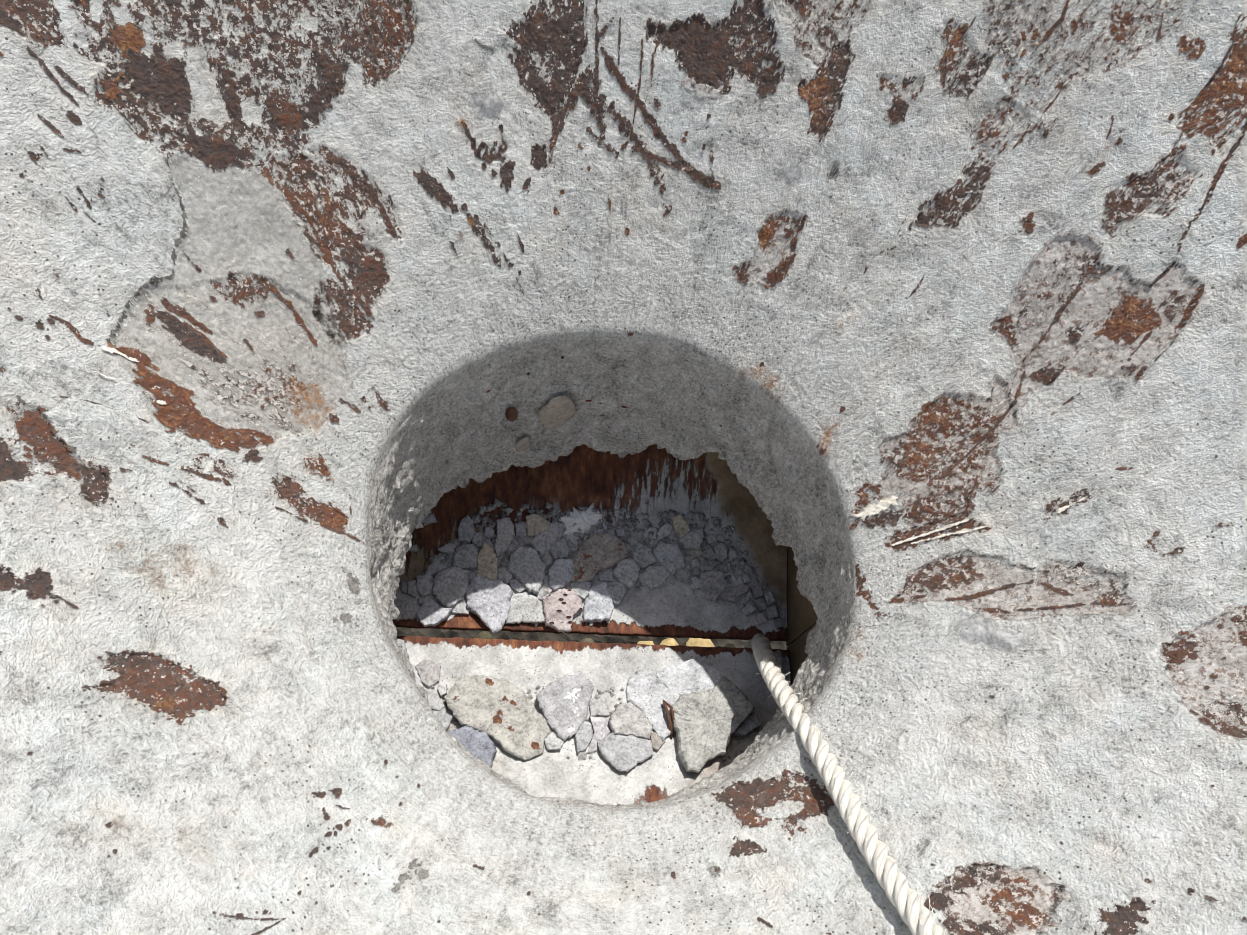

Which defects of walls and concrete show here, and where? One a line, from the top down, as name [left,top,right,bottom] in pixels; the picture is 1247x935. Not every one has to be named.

corrosion [461,0,592,194]
corrosion [645,0,876,142]
corrosion [0,0,418,507]
corrosion [855,0,1247,626]
corrosion [271,452,364,544]
corrosion [0,564,78,609]
spalling [465,574,513,634]
corrosion [83,649,227,725]
spalling [396,639,761,773]
corrosion [1160,603,1247,740]
corrosion [711,769,835,858]
corrosion [924,860,1072,935]